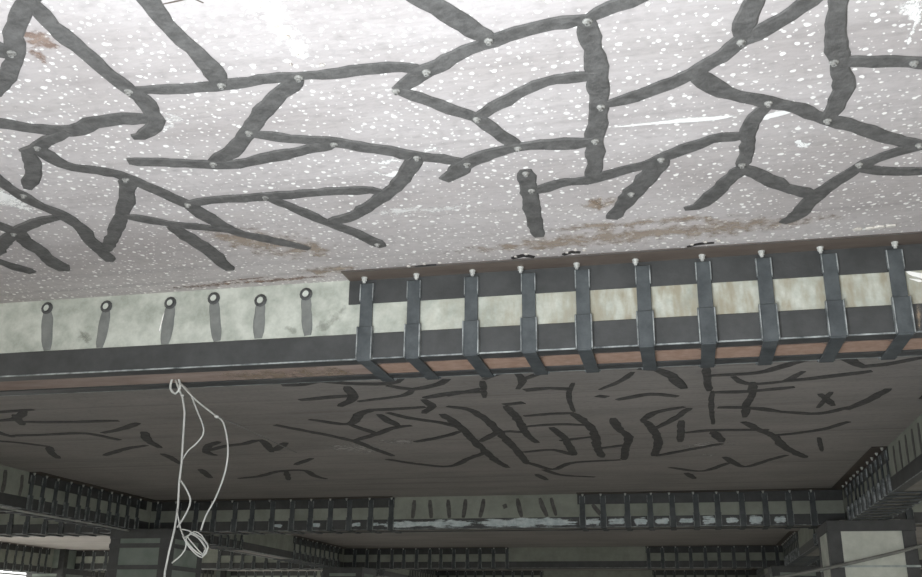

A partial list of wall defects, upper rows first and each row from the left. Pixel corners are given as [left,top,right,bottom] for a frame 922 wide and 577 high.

water stain [899,0,922,46]
rust [24,32,57,62]
crack [0,356,922,519]
water stain [479,517,576,528]